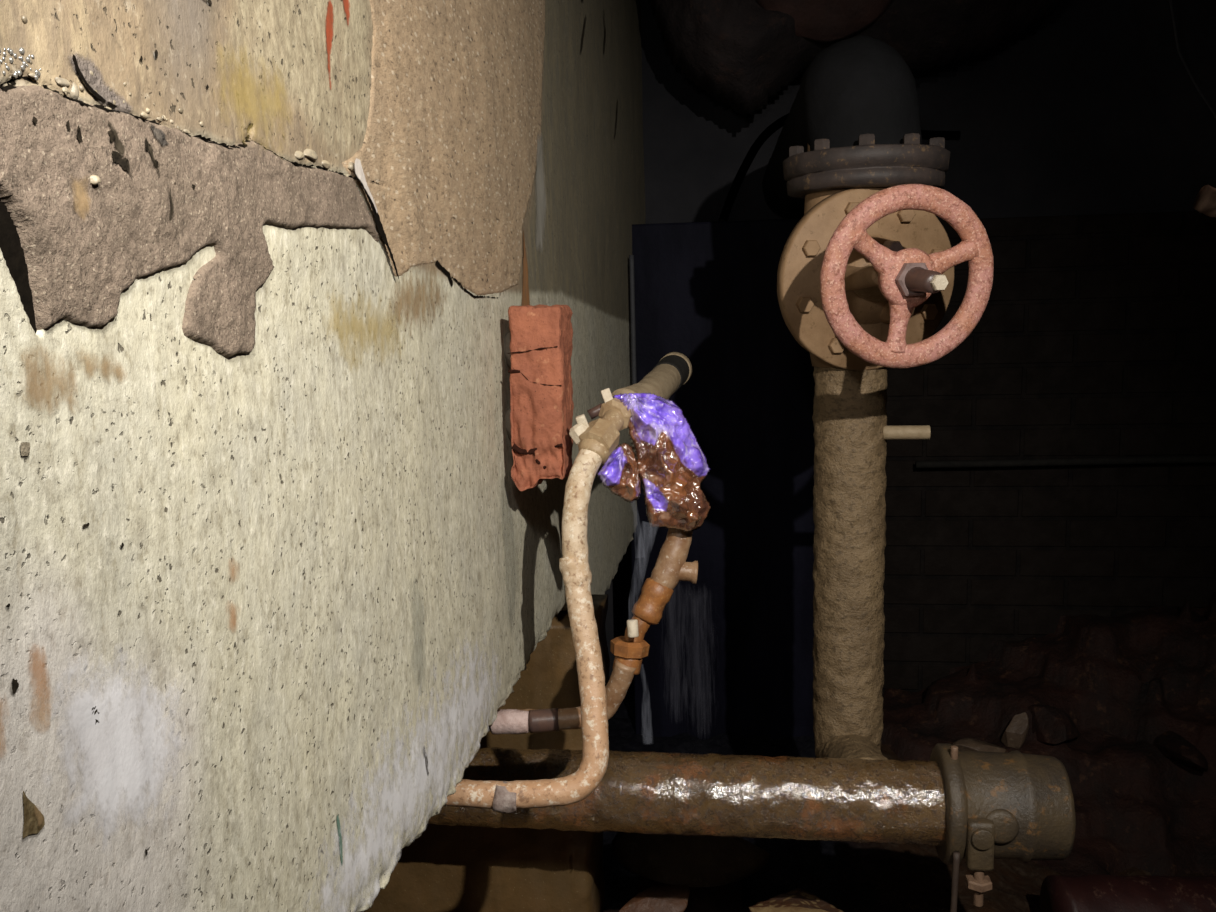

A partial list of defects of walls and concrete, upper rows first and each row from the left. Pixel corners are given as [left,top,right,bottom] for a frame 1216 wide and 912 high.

spalling [0,53,379,358]
peeling [20,442,30,456]